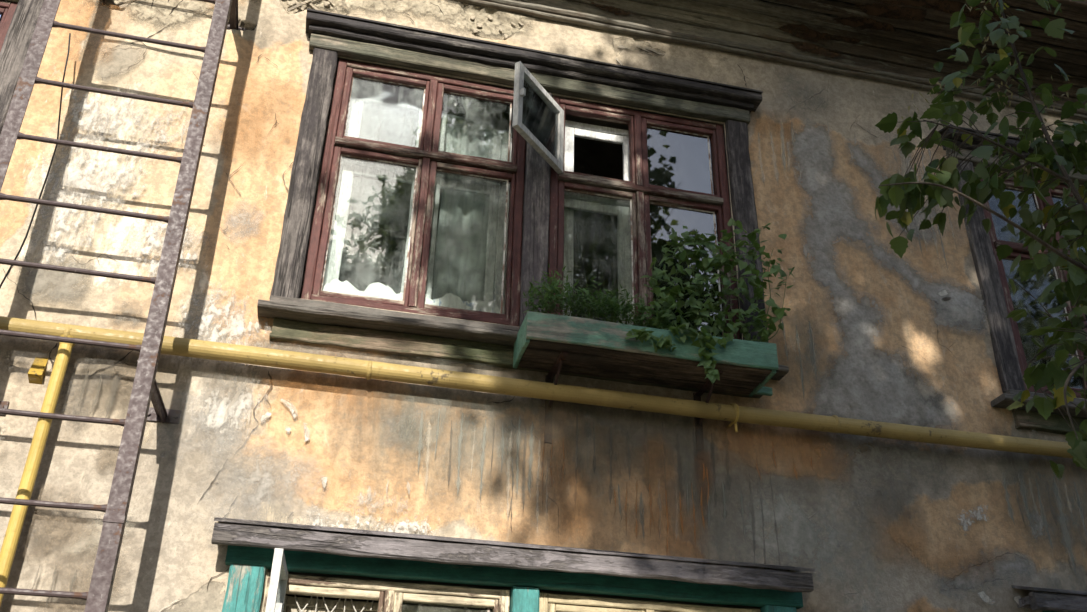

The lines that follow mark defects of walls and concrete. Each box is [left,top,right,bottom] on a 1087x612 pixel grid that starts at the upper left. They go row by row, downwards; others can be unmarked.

spalling [84,0,215,27]
spalling [280,0,532,40]
peeling [792,124,986,428]
crack [198,371,273,518]
leakage [380,388,534,511]